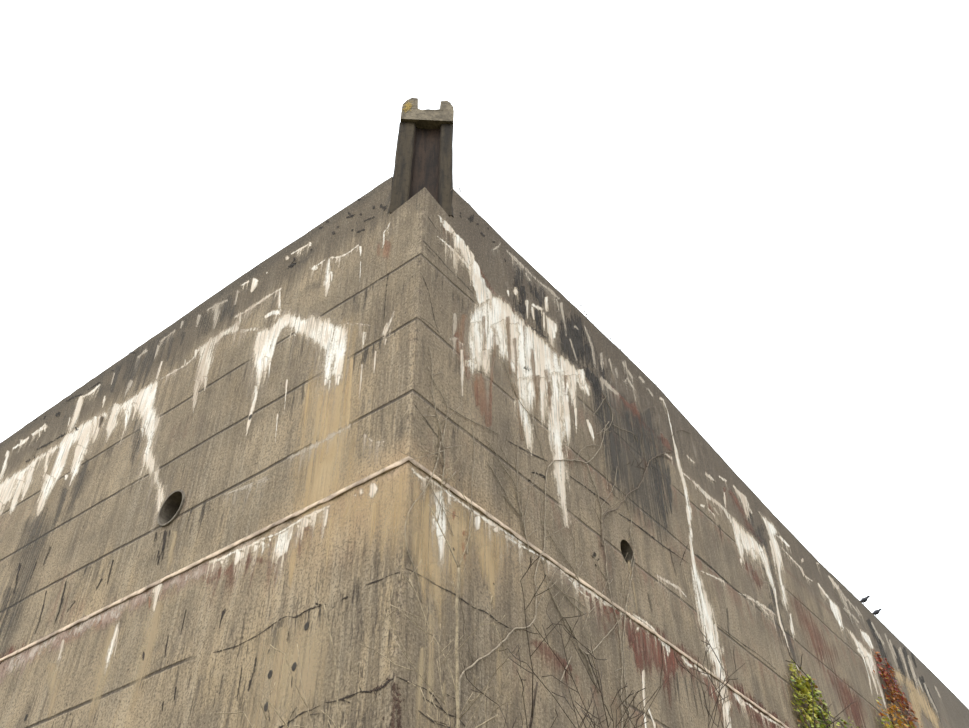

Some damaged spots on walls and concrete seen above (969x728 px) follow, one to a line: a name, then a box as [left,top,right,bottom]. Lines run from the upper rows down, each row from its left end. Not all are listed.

water stain [0,272,402,728]
water stain [311,244,362,297]
water stain [411,215,941,728]